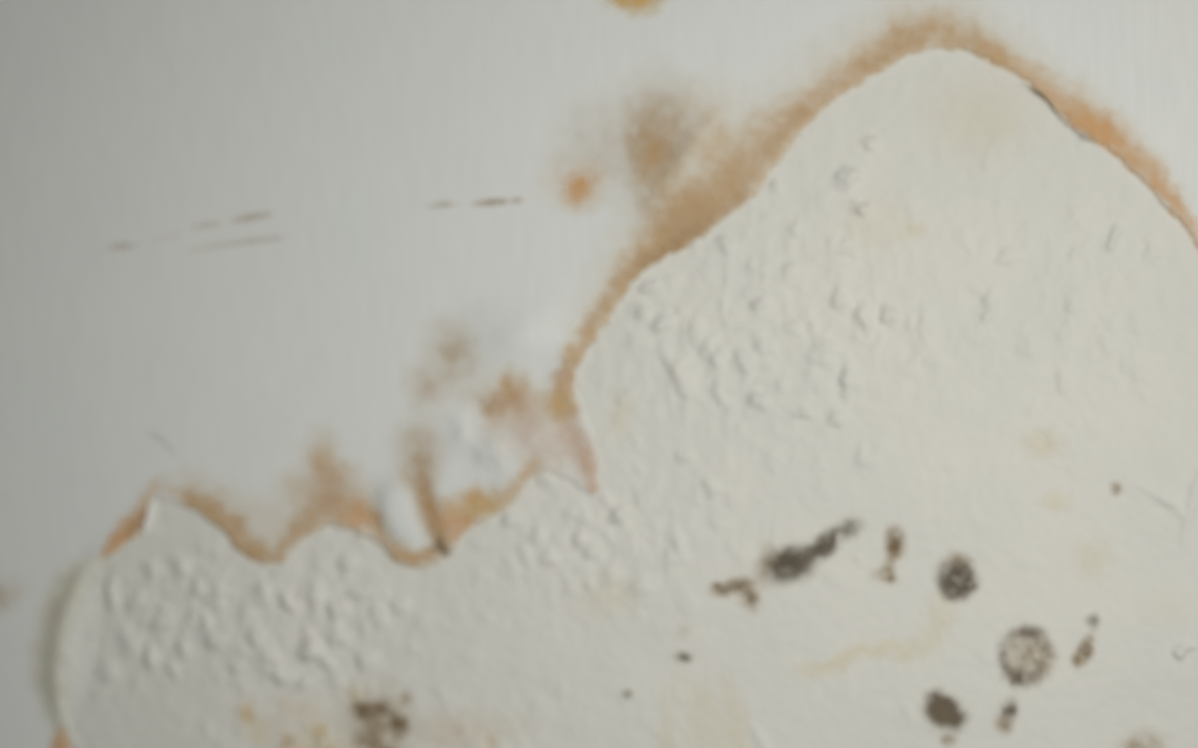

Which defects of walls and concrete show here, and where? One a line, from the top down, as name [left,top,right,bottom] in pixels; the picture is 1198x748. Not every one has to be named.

water stain [1025,74,1184,212]
water stain [555,24,1006,418]
water stain [103,504,148,555]
water stain [185,492,338,562]
water stain [391,456,448,565]
water stain [713,580,757,604]
water stain [766,530,838,580]
water stain [888,532,902,555]
water stain [940,559,977,599]
water stain [356,703,407,733]
water stain [927,692,964,727]
water stain [1002,705,1016,728]